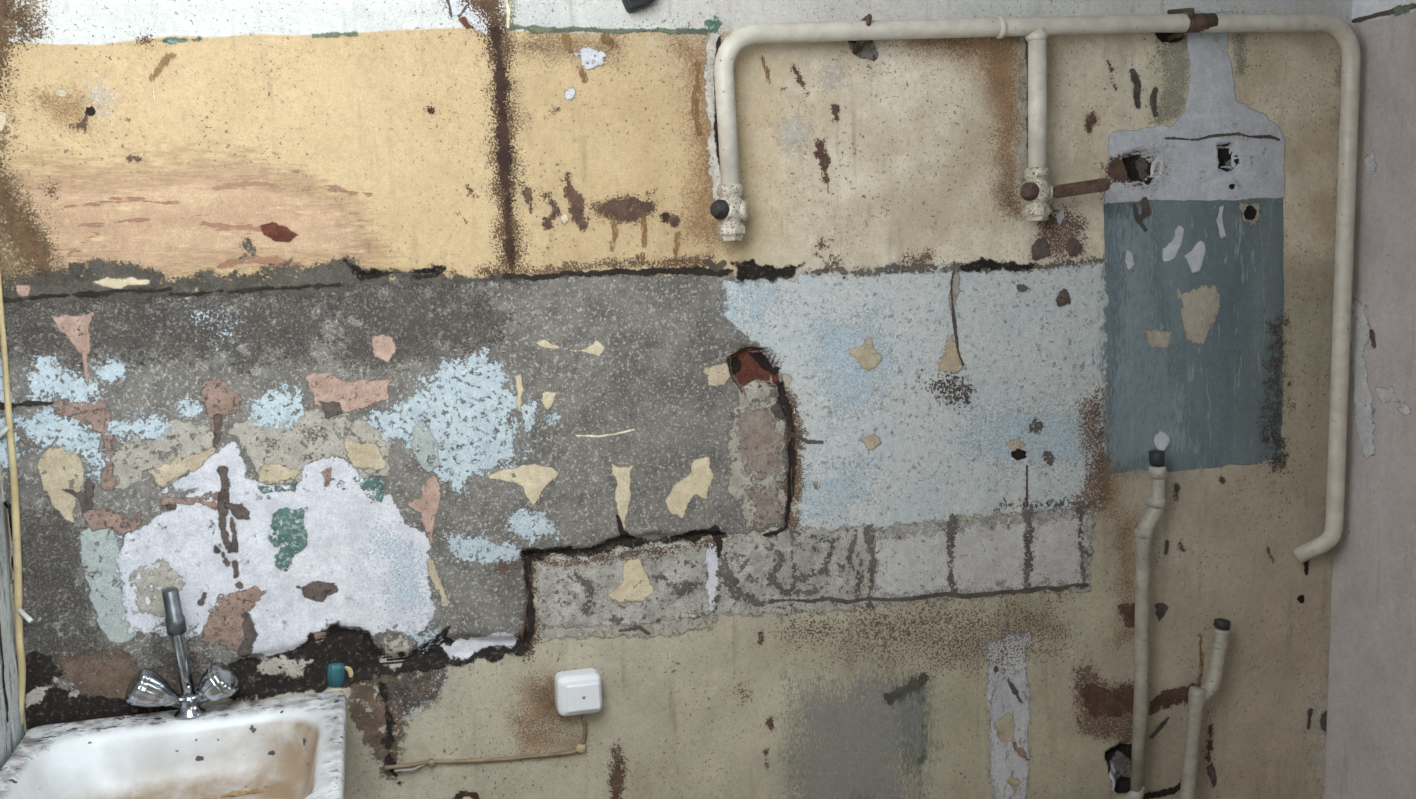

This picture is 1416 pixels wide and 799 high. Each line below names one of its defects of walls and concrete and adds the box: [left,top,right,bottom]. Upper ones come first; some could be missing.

crack [1352,3,1416,23]
peeling [1106,33,1183,117]
leakage [0,0,532,311]
leakage [908,36,1024,215]
peeling [1084,107,1099,133]
peeling [1125,250,1135,270]
peeling [1143,205,1226,349]
peeling [1154,431,1170,451]
peeling [0,204,1112,799]
crack [491,381,824,662]
flaking render [1105,743,1132,794]